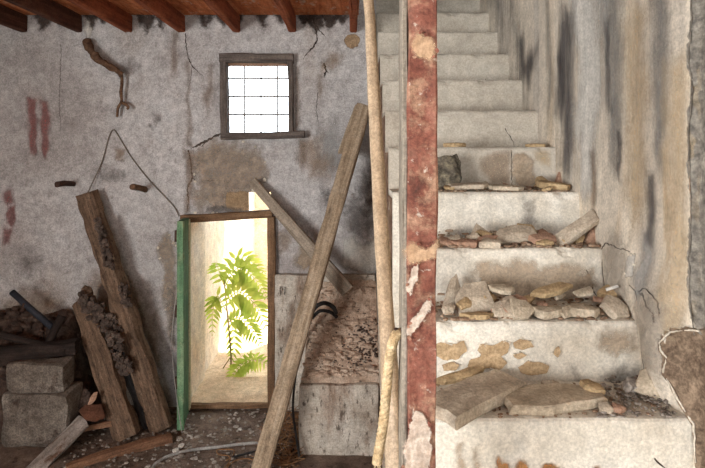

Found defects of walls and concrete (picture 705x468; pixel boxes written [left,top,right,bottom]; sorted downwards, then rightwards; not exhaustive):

water stain [137,15,164,34]
water stain [297,15,349,31]
peeling [412,31,439,59]
water stain [558,0,620,205]
crack [187,134,220,211]
water stain [343,207,376,272]
peeling [405,241,437,296]
water stain [635,177,654,293]
flaking render [658,0,705,468]
peeling [406,297,431,341]
peeling [436,337,549,376]
peeling [401,408,432,468]